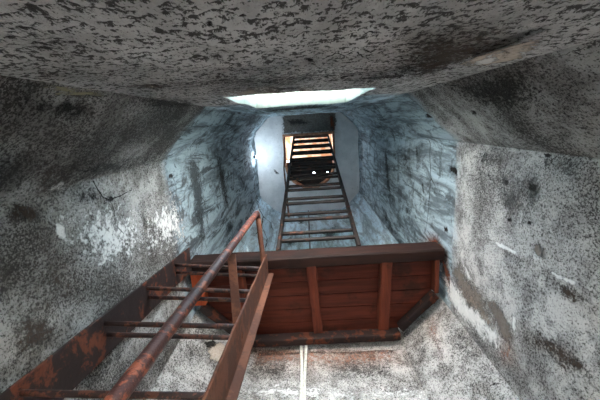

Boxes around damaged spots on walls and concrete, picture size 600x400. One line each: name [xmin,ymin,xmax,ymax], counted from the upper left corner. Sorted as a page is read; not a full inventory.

flaking render [460,40,538,66]
crack [93,180,131,235]